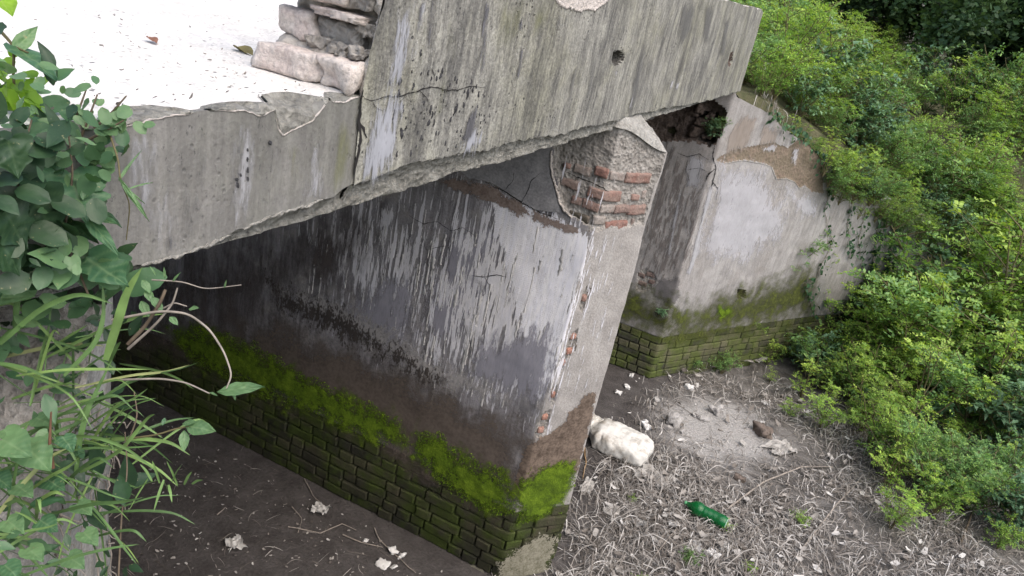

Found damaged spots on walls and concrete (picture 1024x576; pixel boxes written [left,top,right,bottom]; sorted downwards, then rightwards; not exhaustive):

spalling [555,0,608,13]
crack [354,68,486,177]
damp [235,141,250,221]
peeling [126,49,824,438]
crack [485,174,557,219]
damp [131,219,596,503]